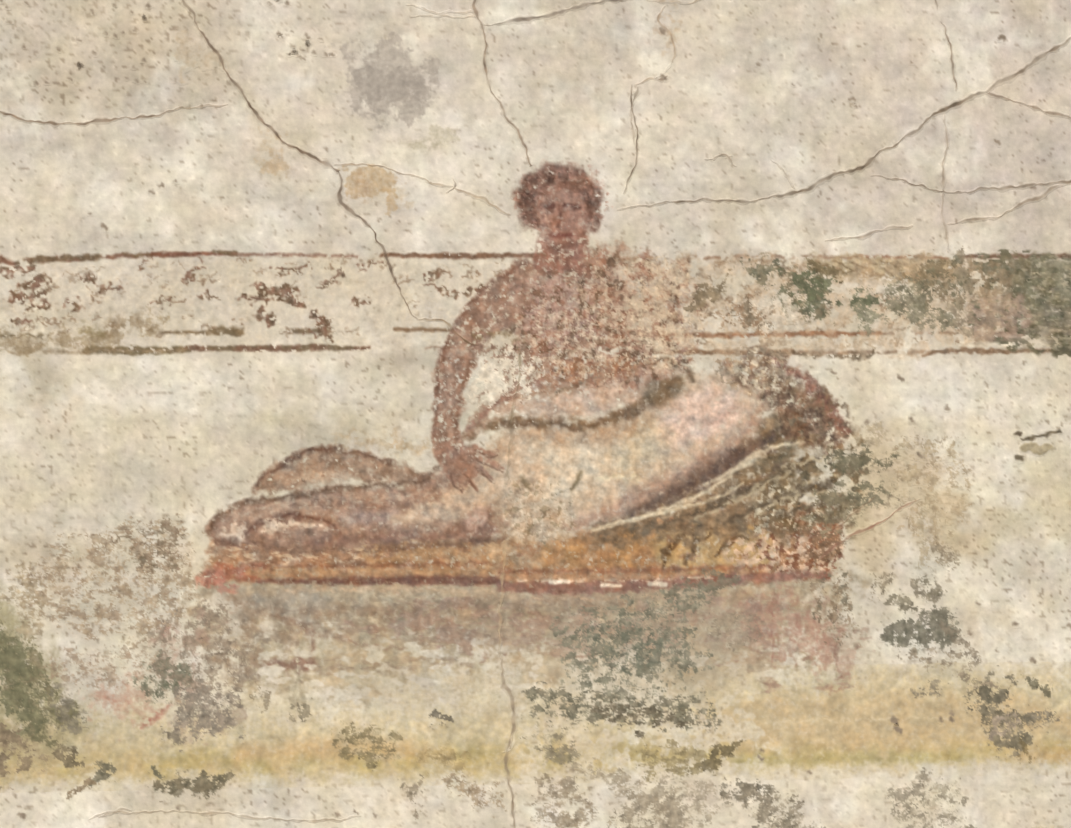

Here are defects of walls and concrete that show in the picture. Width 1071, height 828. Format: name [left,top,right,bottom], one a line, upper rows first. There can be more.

crack [0,0,511,346]
water stain [322,28,463,166]
crack [406,0,1071,252]
crack [505,340,524,489]
water stain [0,702,113,792]
crack [89,806,361,823]
crack [496,531,518,828]